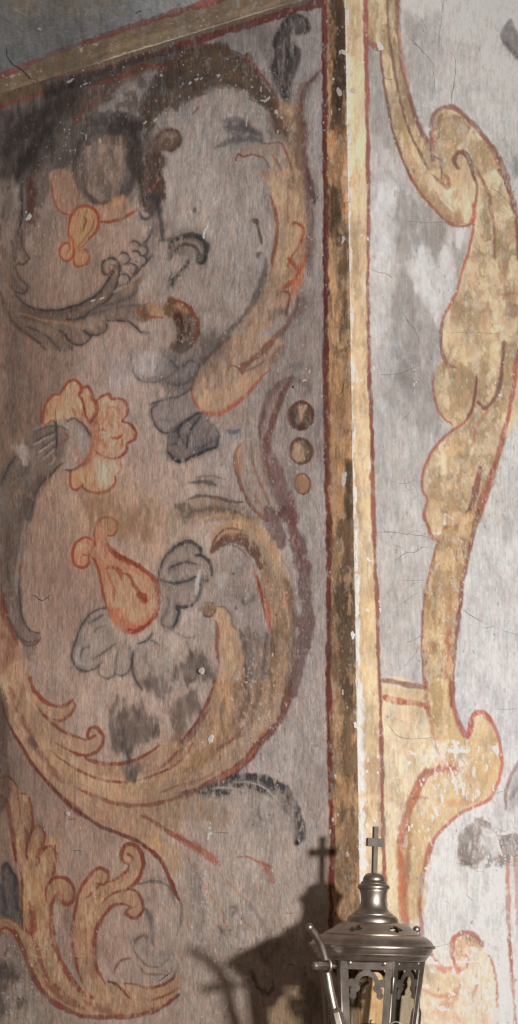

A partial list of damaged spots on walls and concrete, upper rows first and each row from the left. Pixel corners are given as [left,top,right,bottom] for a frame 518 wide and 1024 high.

peeling [407,739,499,813]
peeling [408,794,444,834]